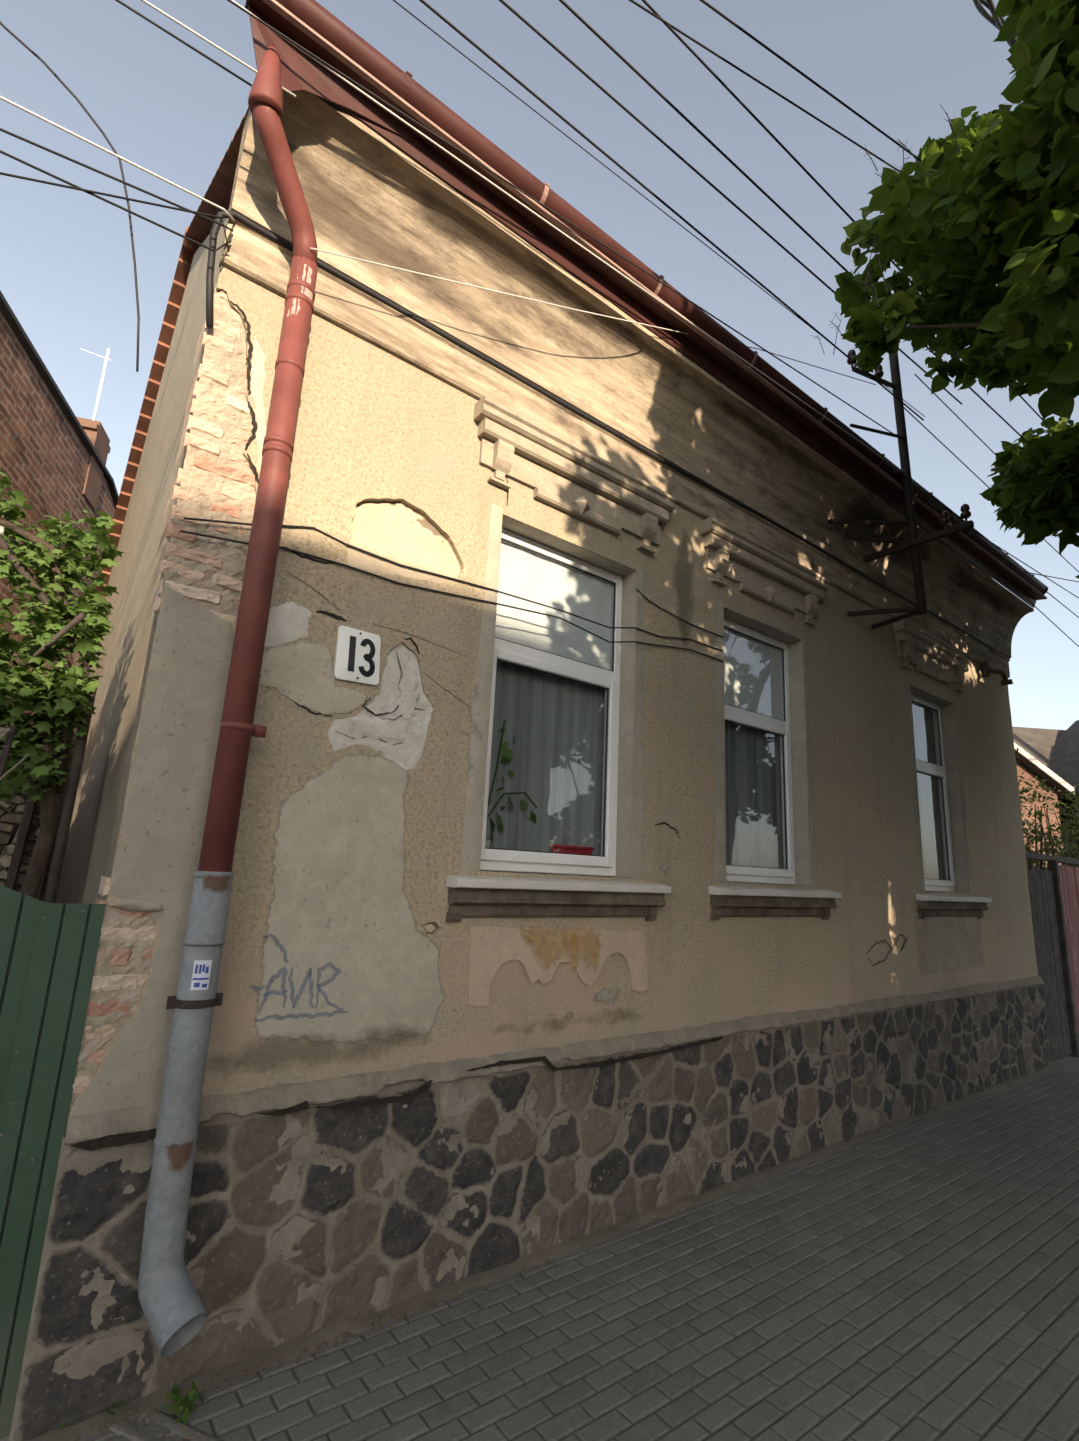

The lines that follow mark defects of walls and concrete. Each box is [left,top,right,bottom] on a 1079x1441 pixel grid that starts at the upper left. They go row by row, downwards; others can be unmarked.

leakage [307,170,435,282]
leakage [424,193,630,337]
flaking render [146,284,267,622]
flaking render [328,643,433,770]
flaking render [67,876,164,1122]